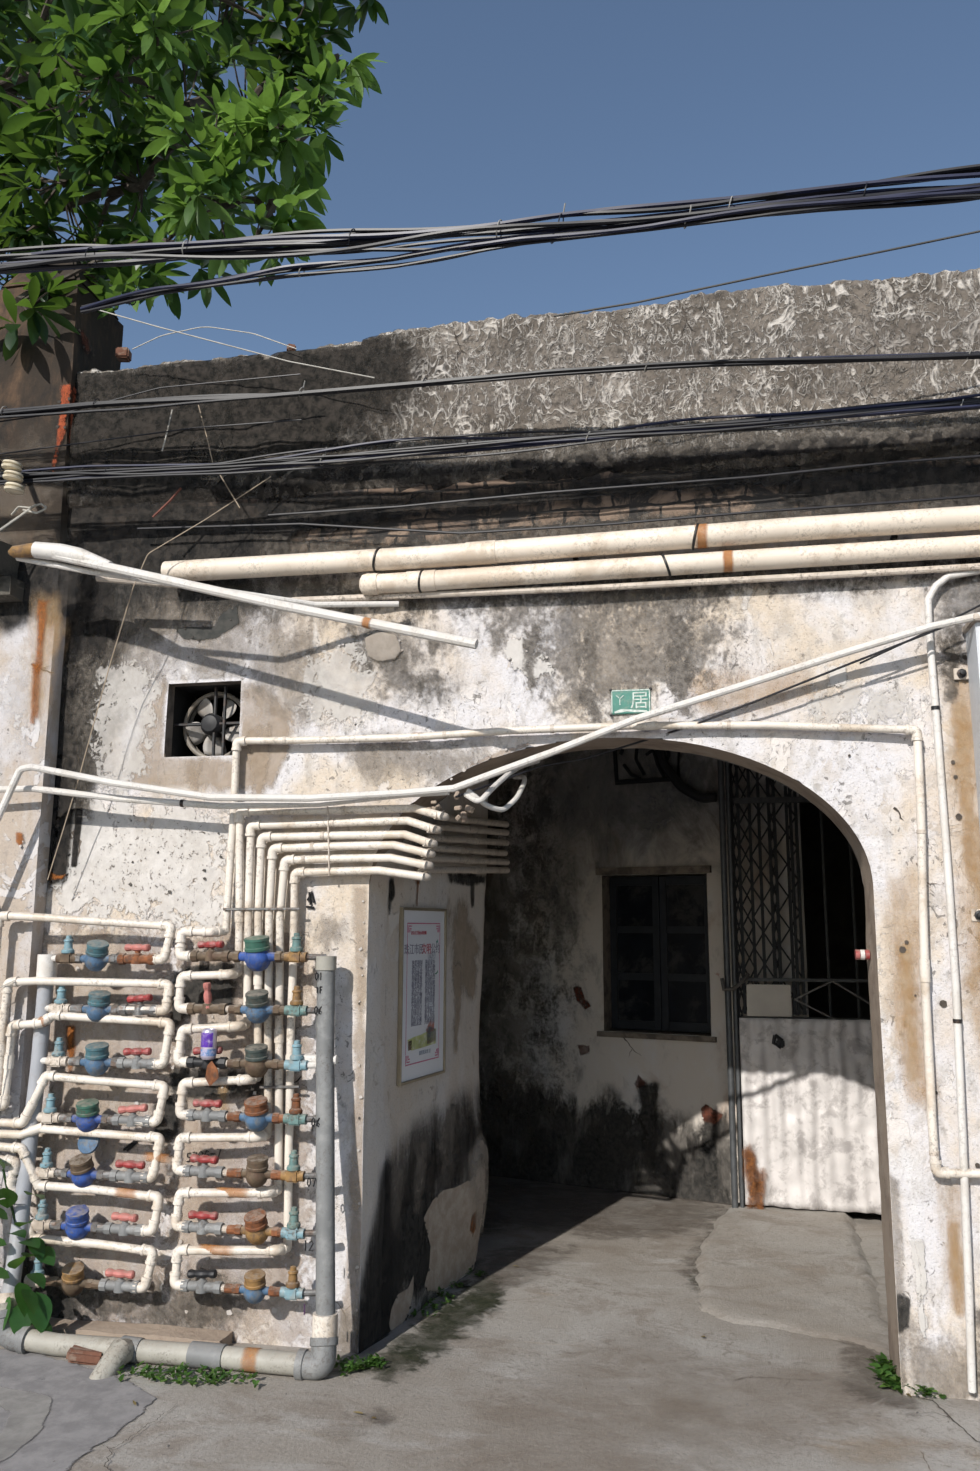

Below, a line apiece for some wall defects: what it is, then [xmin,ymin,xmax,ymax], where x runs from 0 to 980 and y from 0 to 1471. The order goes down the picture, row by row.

rust [31,600,49,723]
leakage [0,331,980,1354]
flaking render [389,1168,485,1331]
rust [743,1148,766,1209]